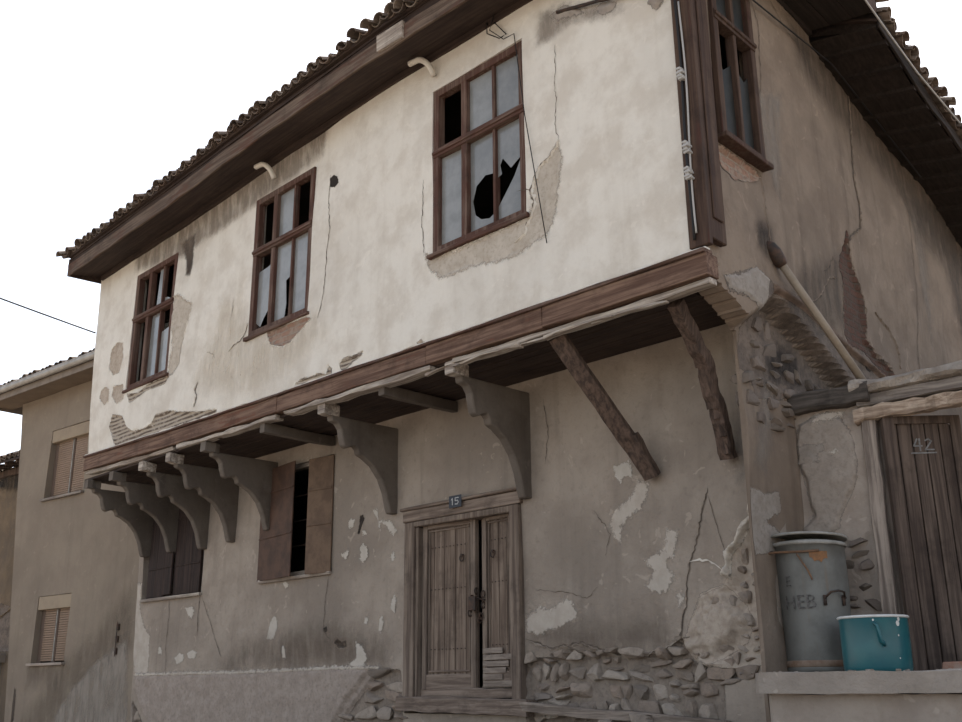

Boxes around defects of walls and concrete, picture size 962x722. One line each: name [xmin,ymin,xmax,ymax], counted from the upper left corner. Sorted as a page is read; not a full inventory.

crack [317,175,331,318]
flaking render [425,146,563,278]
crack [515,48,559,243]
crack [847,95,862,240]
flaking render [99,293,217,446]
flaking render [266,317,311,348]
flaking render [724,230,894,432]
peeling [610,460,649,543]
flaking render [0,603,11,652]
crack [526,488,725,661]
spalling [525,487,782,722]